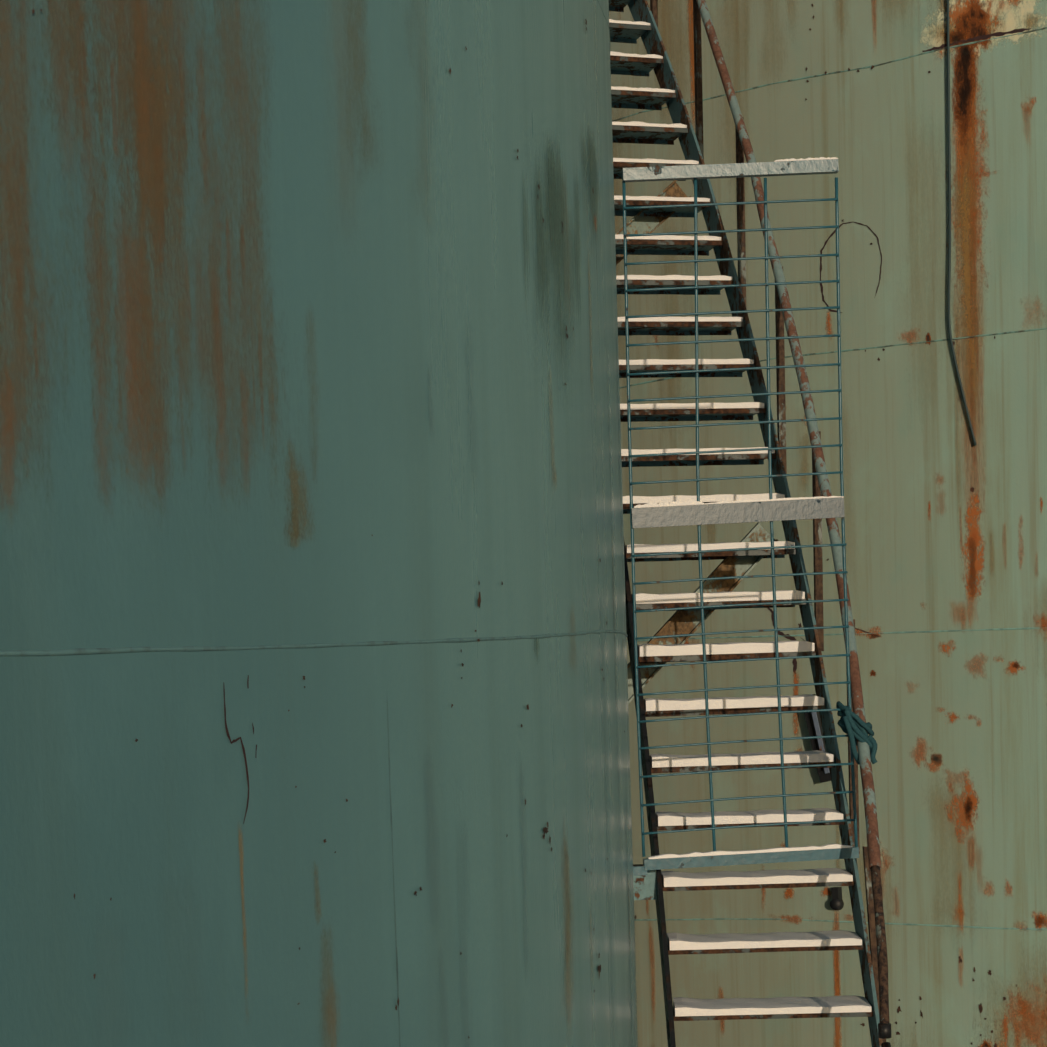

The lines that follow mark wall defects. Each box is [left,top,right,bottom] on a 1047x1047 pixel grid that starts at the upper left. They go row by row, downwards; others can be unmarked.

peeling [921,0,1047,57]
rust [952,43,986,428]
rust [957,486,984,623]
crack [223,675,257,824]
rust [915,740,942,771]
rust [946,774,977,861]
rust [978,1014,1008,1047]